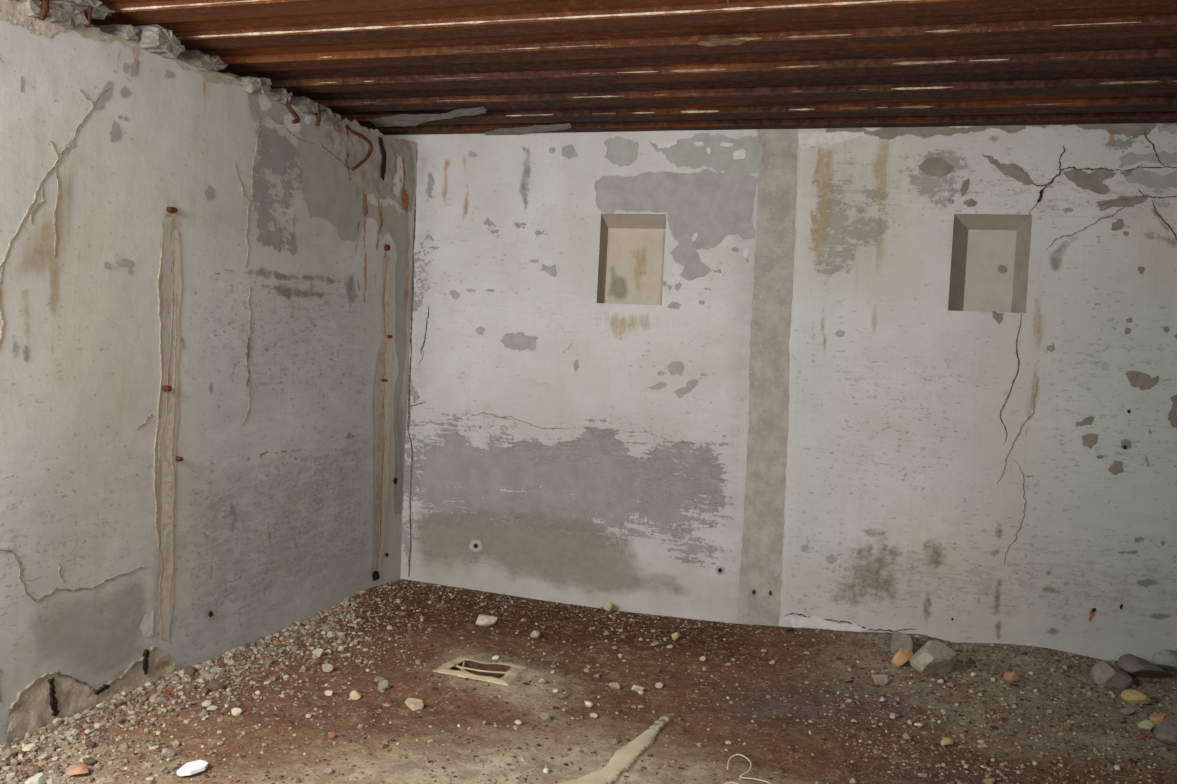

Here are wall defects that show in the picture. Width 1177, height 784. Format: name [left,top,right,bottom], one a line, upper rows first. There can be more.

spalling [0,0,147,110]
crack [0,88,110,341]
rust [356,188,383,302]
rust [401,157,409,213]
peeling [825,123,1177,207]
crack [1029,131,1177,249]
peeling [252,94,868,632]
crack [997,320,1038,562]
peeling [1076,416,1132,475]
peeling [1125,371,1159,391]
peeling [1168,394,1177,428]
spalling [6,646,181,743]